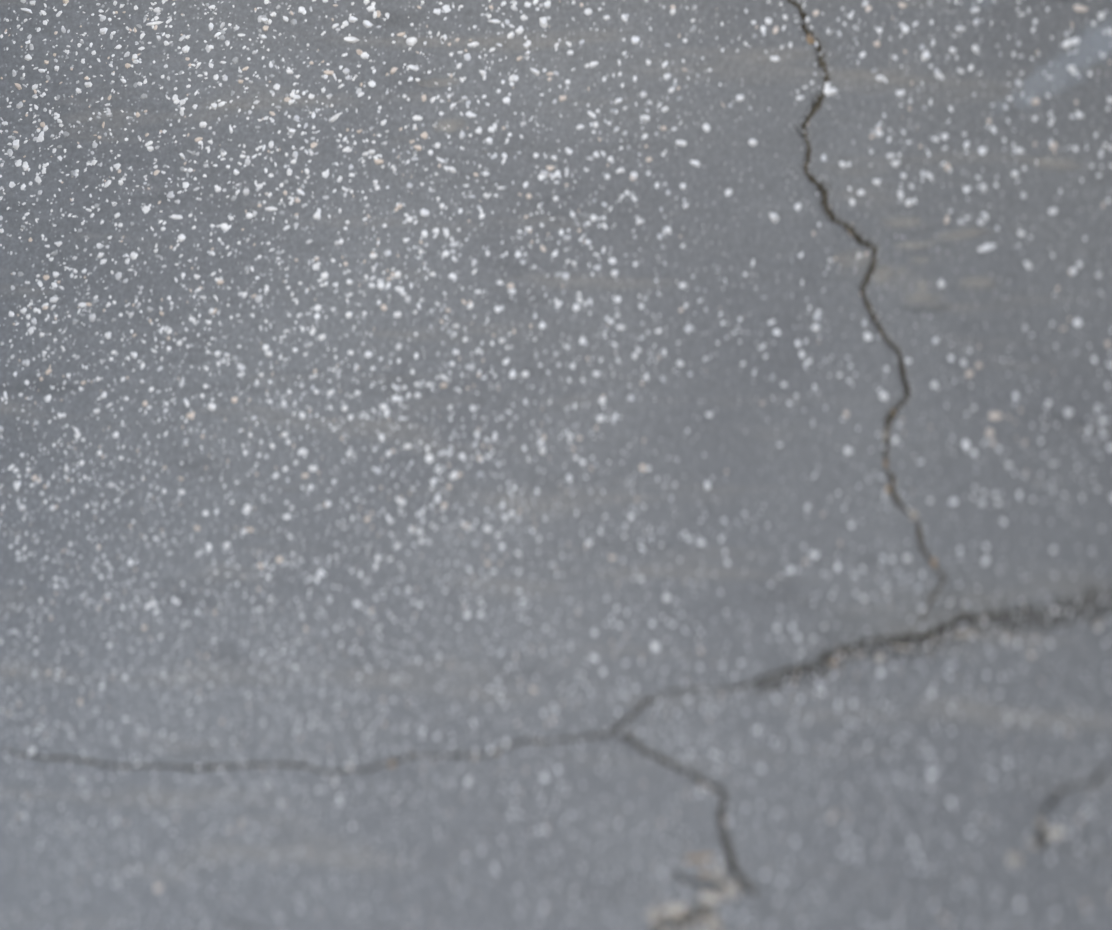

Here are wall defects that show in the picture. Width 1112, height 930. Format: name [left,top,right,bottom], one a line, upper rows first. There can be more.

crack [787,0,947,629]
crack [0,590,1111,895]